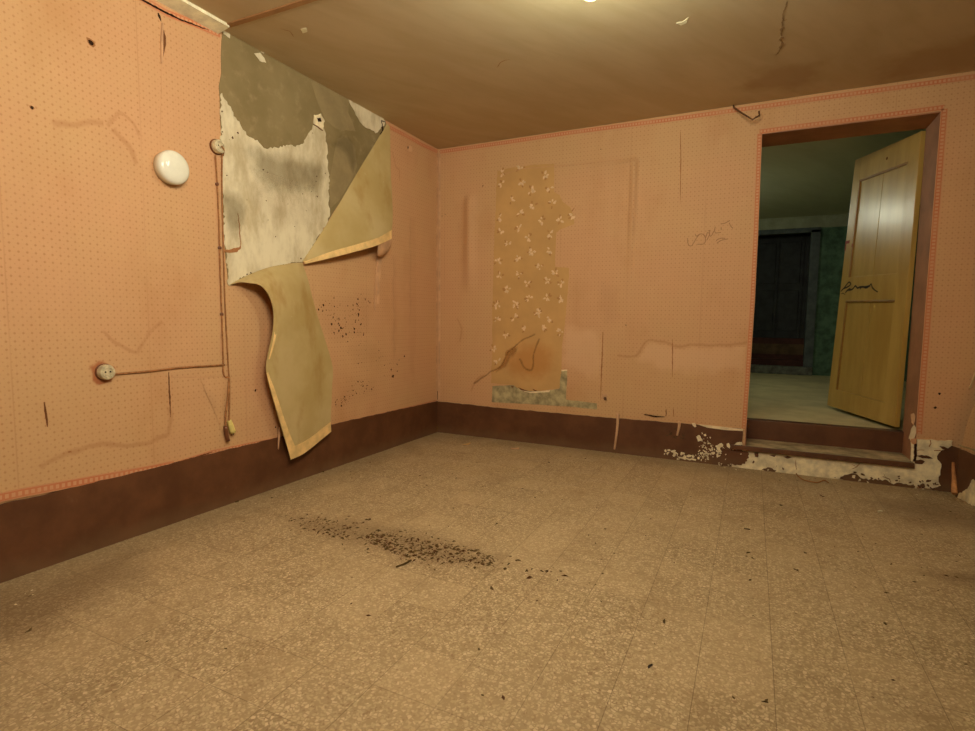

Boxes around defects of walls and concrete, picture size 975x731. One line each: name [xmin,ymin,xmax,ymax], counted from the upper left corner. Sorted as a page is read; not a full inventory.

flaking render [219,31,386,286]
flaking render [492,370,597,409]
peeling [664,424,791,472]
flaking render [834,439,952,491]
peeling [957,479,975,506]